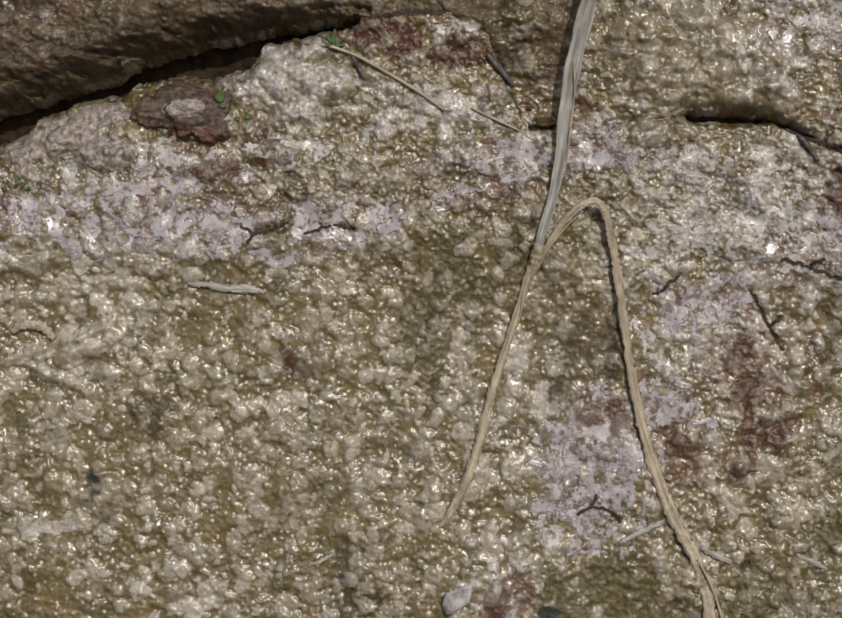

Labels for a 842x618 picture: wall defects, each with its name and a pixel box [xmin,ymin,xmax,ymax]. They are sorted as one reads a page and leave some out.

crack [368,8,446,20]
crack [0,26,348,145]
crack [685,116,758,124]
crack [787,131,842,154]